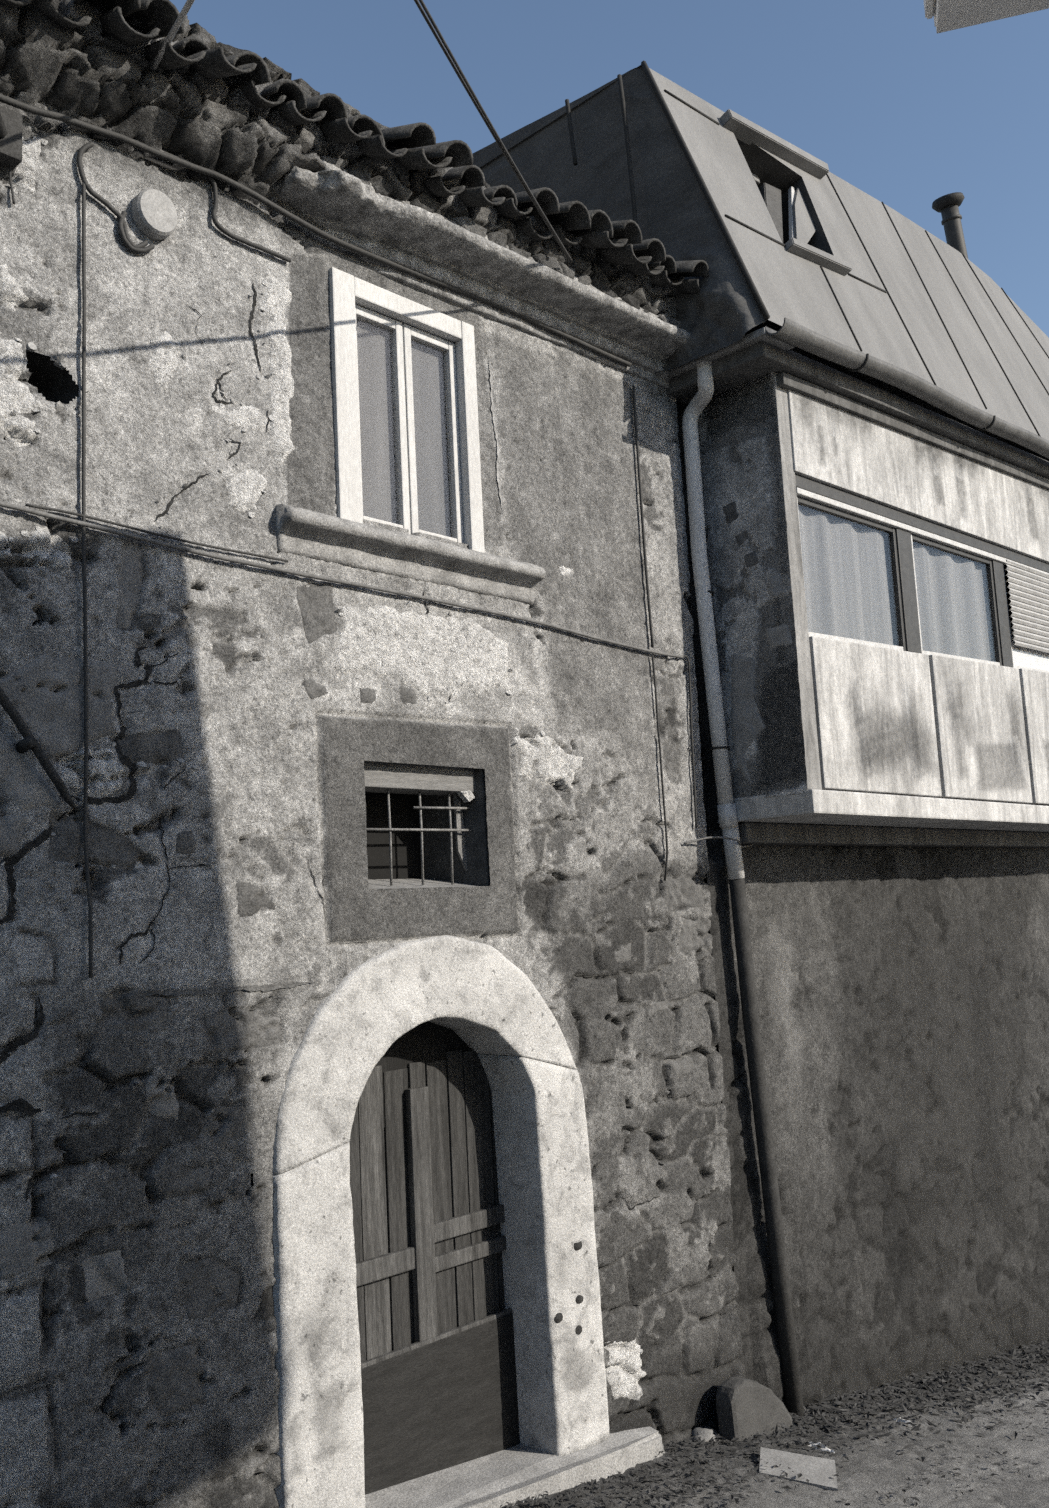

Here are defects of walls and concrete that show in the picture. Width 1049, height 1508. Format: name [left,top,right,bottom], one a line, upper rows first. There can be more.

peeling [3,136,48,192]
peeling [0,264,29,312]
spalling [0,337,90,450]
crack [155,281,270,529]
crack [0,645,210,964]
crack [0,995,44,1065]
crack [0,1098,99,1118]